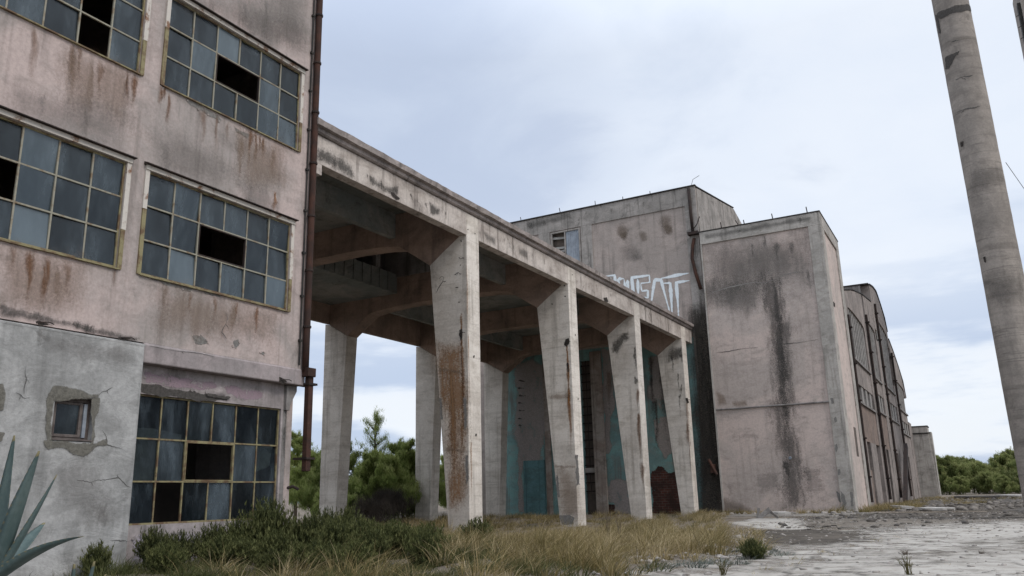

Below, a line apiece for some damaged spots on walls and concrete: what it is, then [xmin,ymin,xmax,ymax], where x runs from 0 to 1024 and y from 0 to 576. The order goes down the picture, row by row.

flaking render [945,51,959,69]
flaking render [935,4,971,33]
corrosion [26,255,49,291]
flaking render [44,385,107,457]
flaking render [192,334,209,345]
corrosion [437,283,472,502]
peeling [512,359,545,512]
peeling [600,348,615,454]
flaking render [647,356,681,514]
leakage [668,306,722,512]
leakage [713,251,805,506]